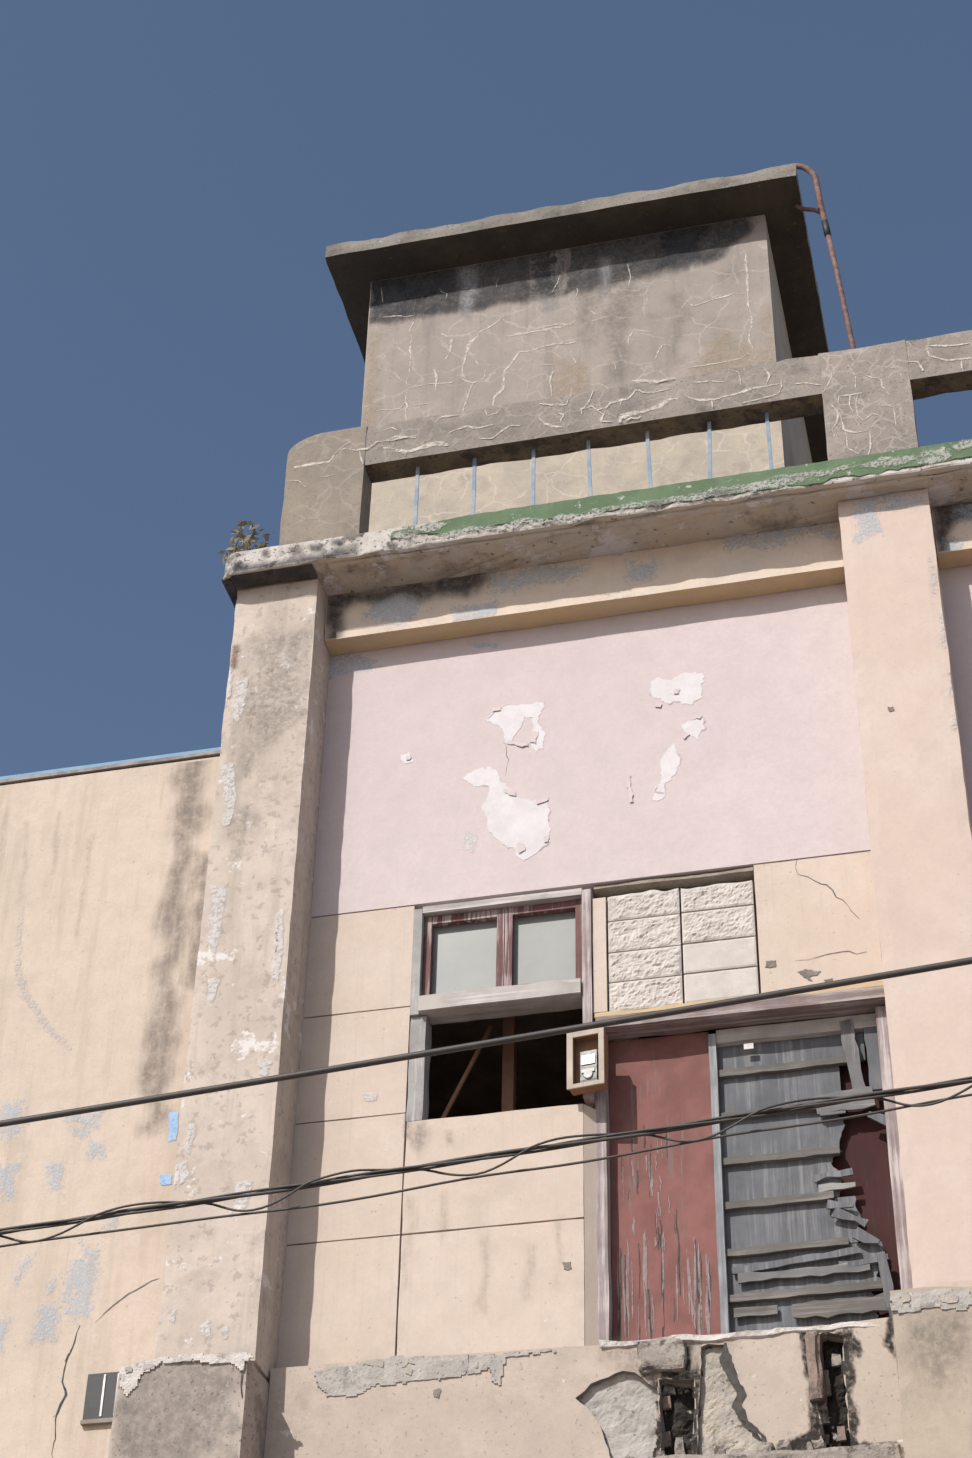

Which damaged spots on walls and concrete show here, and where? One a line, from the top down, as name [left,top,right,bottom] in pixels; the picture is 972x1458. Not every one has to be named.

water stain [370,218,751,322]
crack [290,250,972,487]
water stain [935,502,972,550]
peeling [486,702,546,752]
peeling [648,672,707,801]
peeling [463,766,552,861]
crack [795,860,852,912]
peeling [159,1112,196,1185]
peeling [235,1181,251,1208]
flaking render [578,1125,763,1458]
flaking render [314,1349,556,1398]
spalling [819,1340,851,1448]